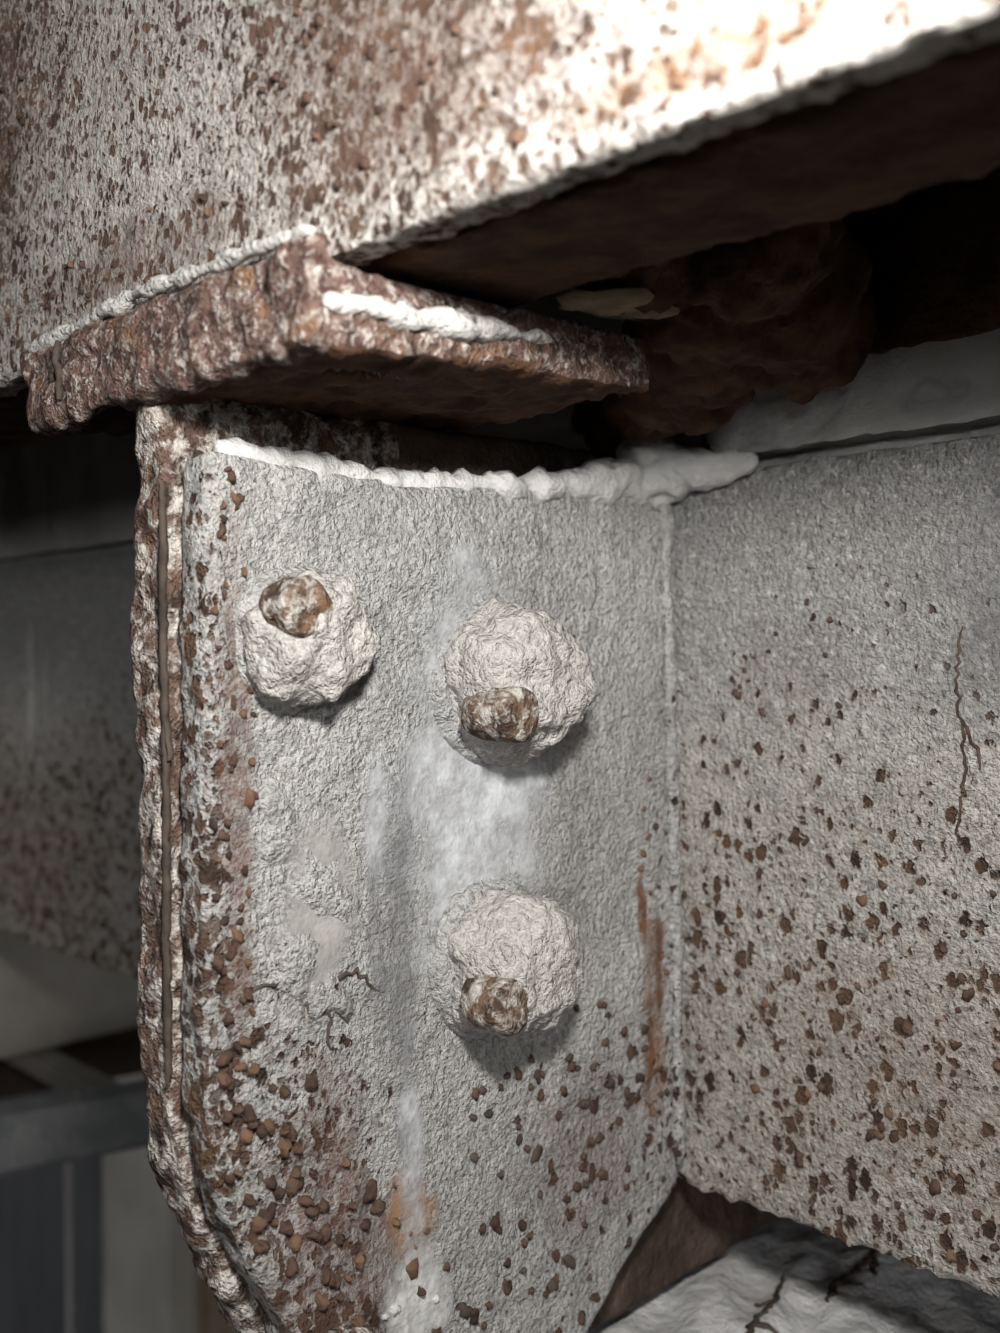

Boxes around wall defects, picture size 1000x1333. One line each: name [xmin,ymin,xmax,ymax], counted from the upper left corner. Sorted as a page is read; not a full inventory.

rust [752,0,818,45]
leakage [706,391,837,449]
rust [217,466,245,541]
crack [954,627,981,845]
rust [244,787,259,811]
rust [208,818,252,994]
rust [222,986,255,1027]
rust [955,973,975,1013]
rust [859,1105,900,1142]
leakage [381,1242,443,1333]
crack [745,1274,785,1333]
crack [824,1249,880,1303]